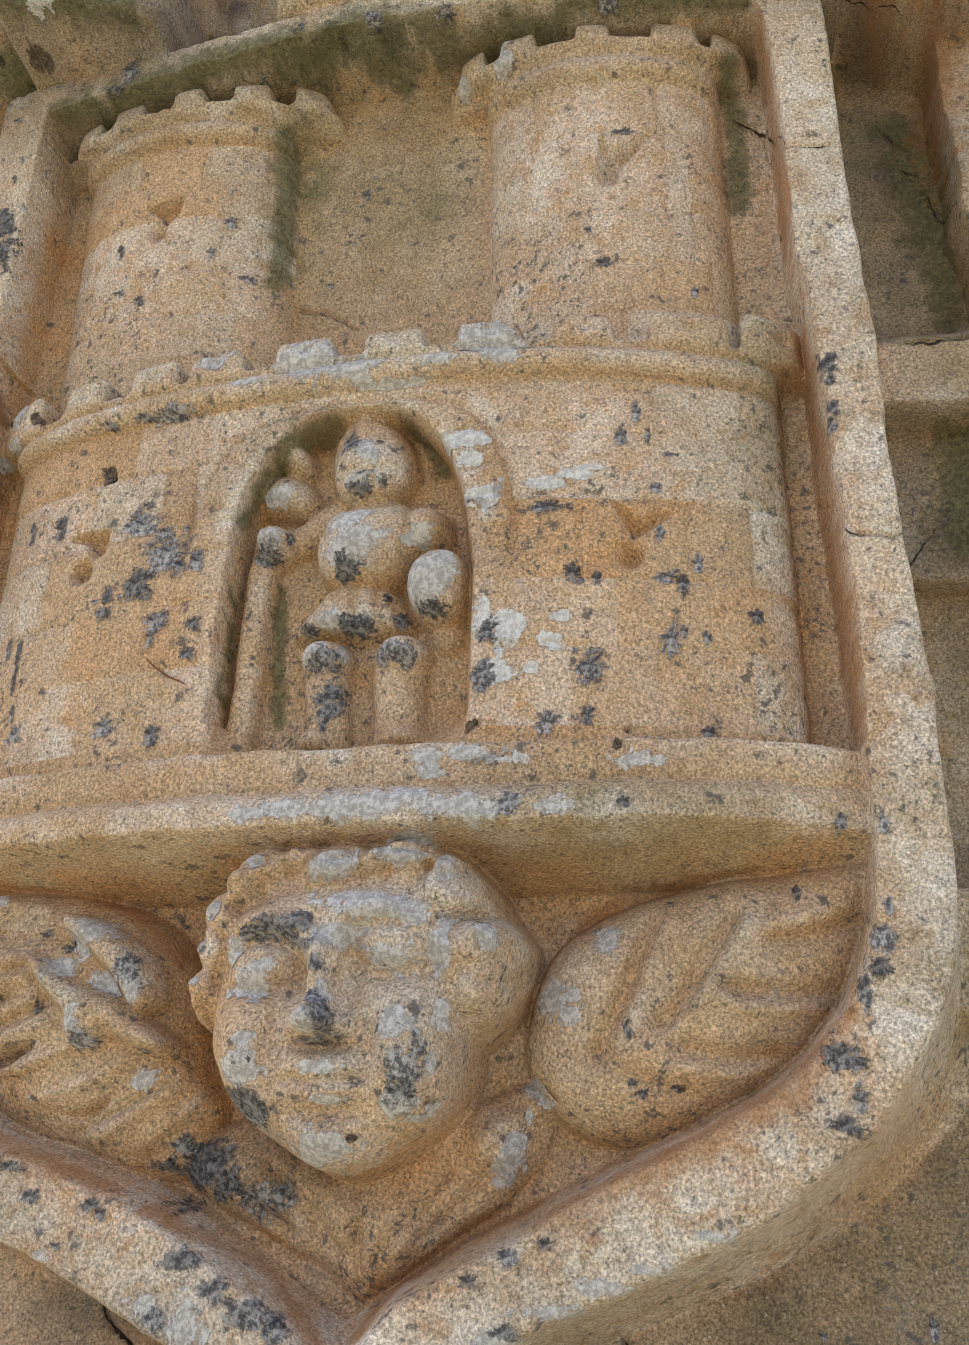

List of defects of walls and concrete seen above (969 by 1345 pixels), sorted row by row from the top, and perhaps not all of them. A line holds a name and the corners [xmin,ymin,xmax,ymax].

crack [836,0,902,16]
crack [103,1305,133,1345]